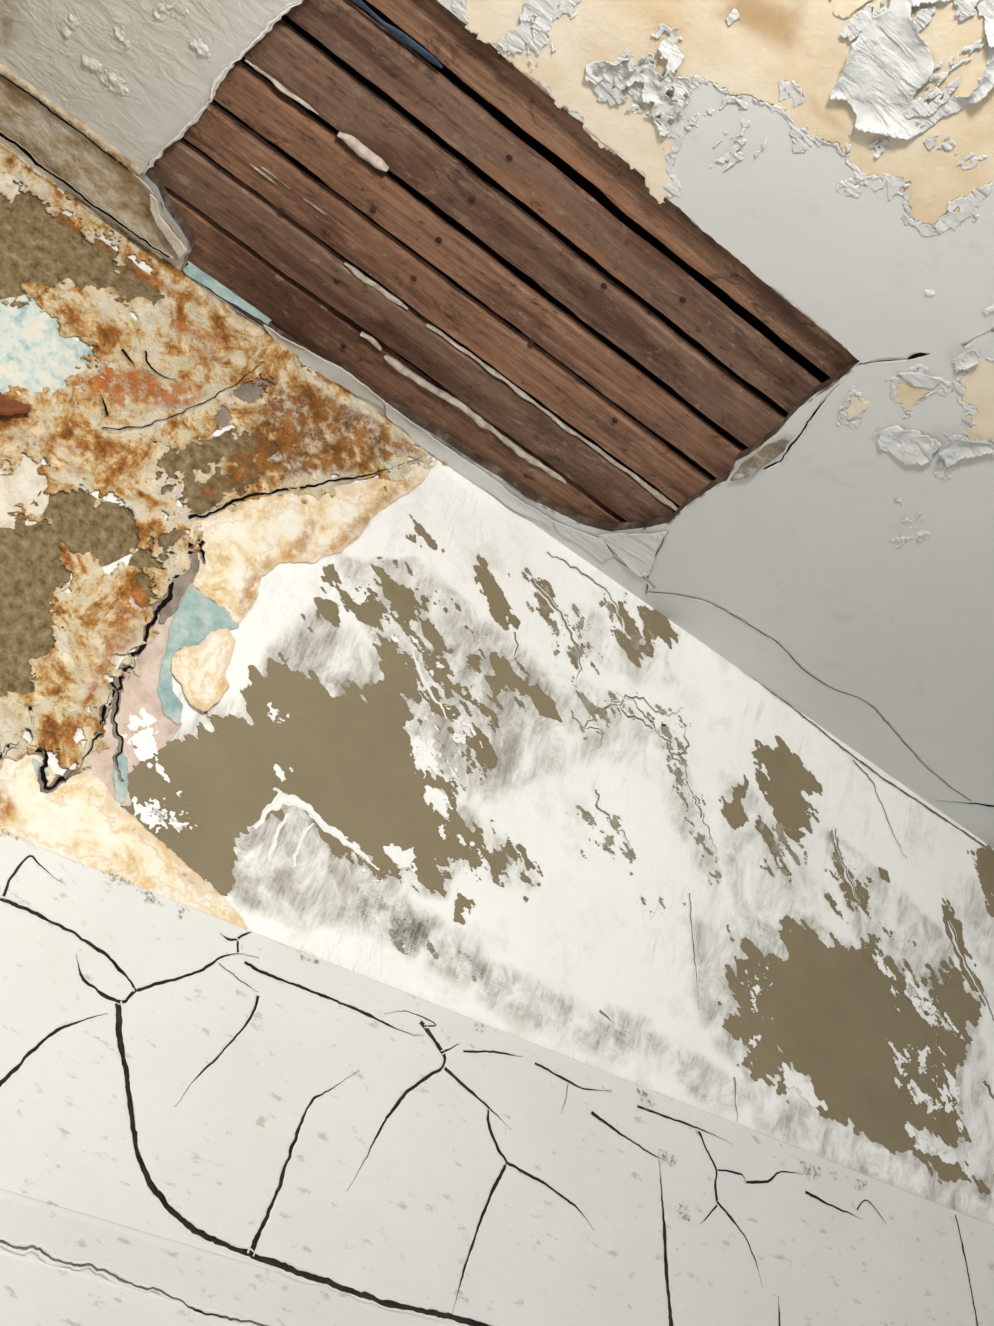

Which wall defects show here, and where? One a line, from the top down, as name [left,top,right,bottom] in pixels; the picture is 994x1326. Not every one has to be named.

peeling [451,0,994,237]
rust [76,351,195,407]
rust [227,371,410,484]
peeling [0,0,793,929]
peeling [808,363,871,429]
peeling [877,350,994,481]
rust [92,589,145,690]
crack [0,455,423,794]
crack [529,530,994,873]
crack [0,853,887,1326]
crack [982,1080,994,1105]
crack [954,1215,980,1326]